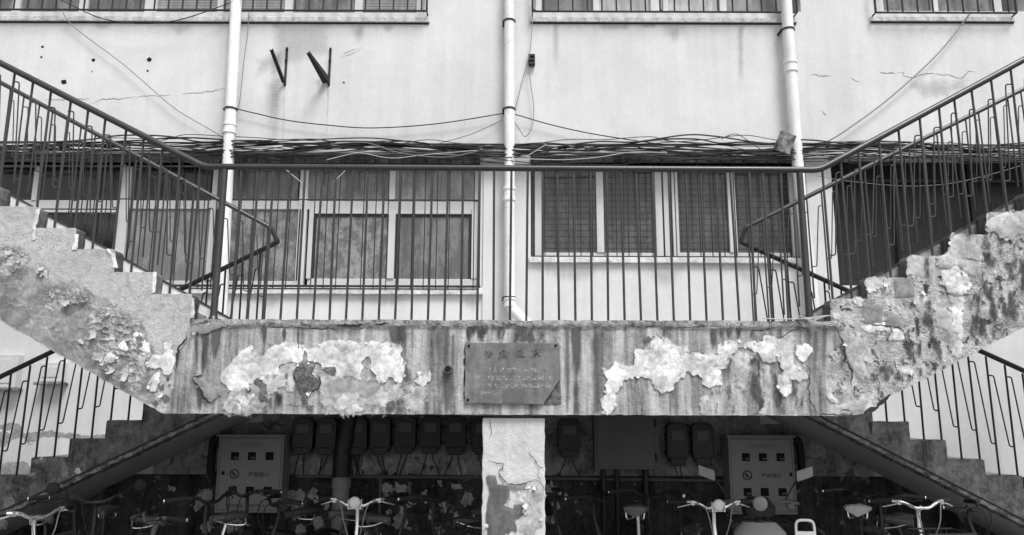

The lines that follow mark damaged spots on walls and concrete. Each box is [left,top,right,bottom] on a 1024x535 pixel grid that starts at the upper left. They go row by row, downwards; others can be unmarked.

peeling [985,209,1024,241]
peeling [0,208,176,406]
peeling [193,340,431,413]
damp [314,325,547,416]
damp [566,327,581,412]
damp [594,328,604,411]
peeling [600,334,813,415]
damp [711,328,753,345]
peeling [852,232,982,360]
damp [967,235,1024,345]
crack [494,452,544,494]
spalling [484,475,568,535]